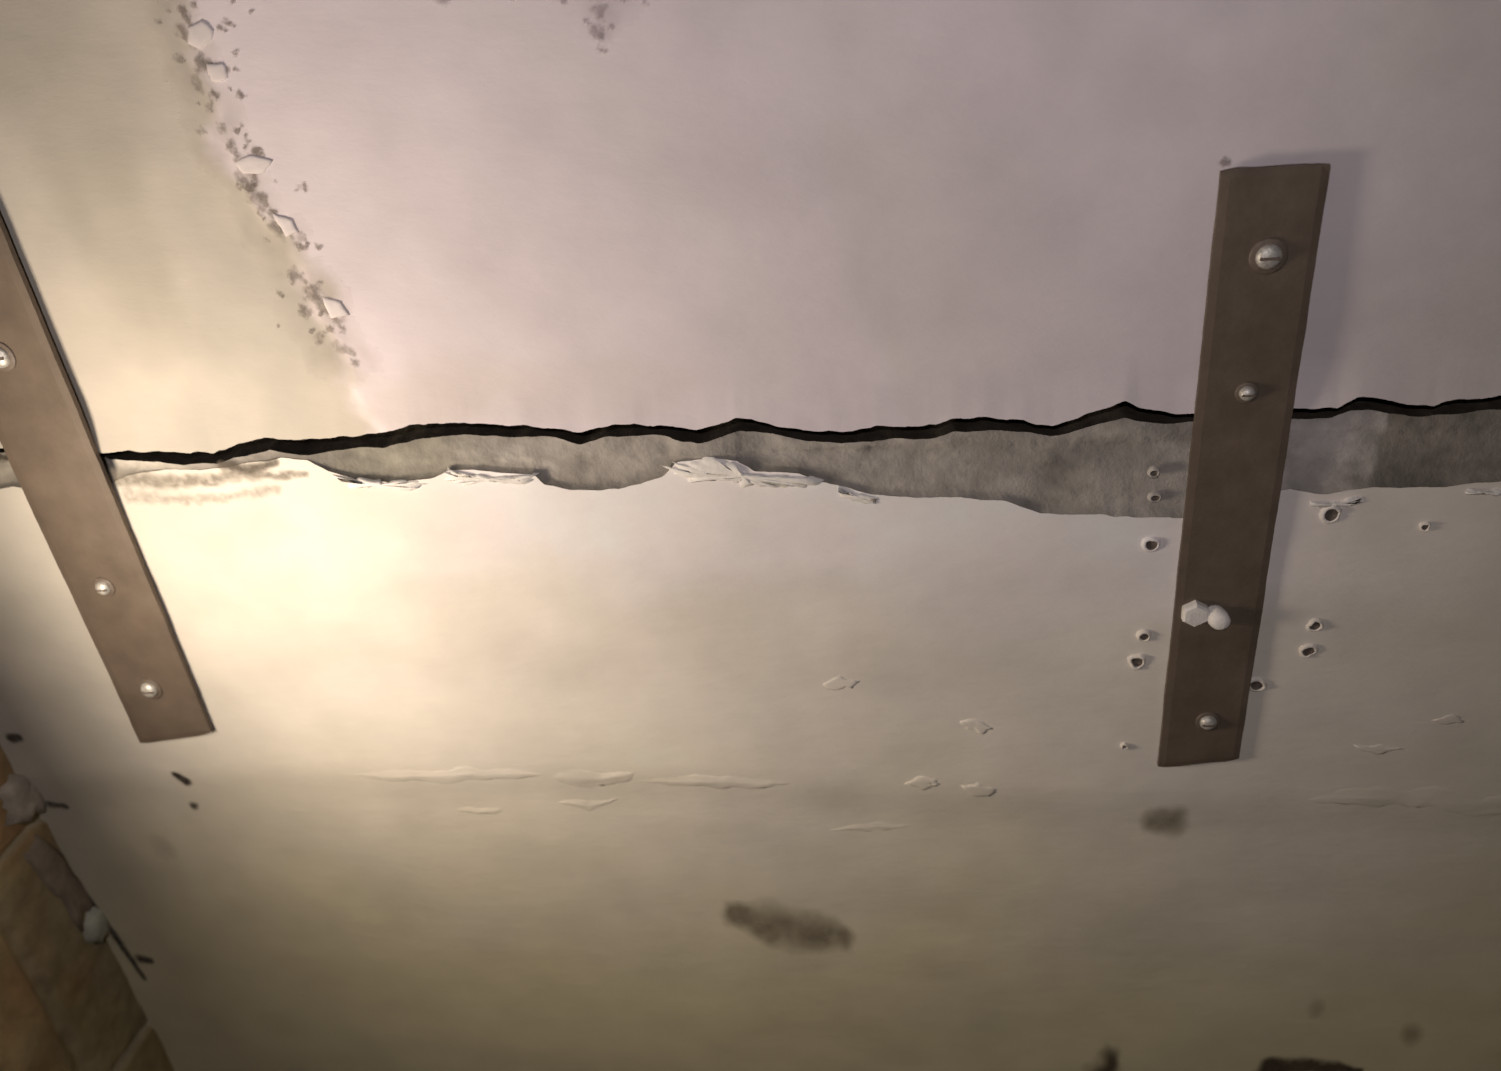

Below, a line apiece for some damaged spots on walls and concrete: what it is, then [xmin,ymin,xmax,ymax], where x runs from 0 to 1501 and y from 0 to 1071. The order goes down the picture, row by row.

crack [1292,395,1501,419]
crack [0,448,8,460]
spalling [0,452,21,489]
crack [99,401,1194,487]
spalling [100,418,1193,518]
spalling [1281,409,1501,508]
damp [727,906,848,944]